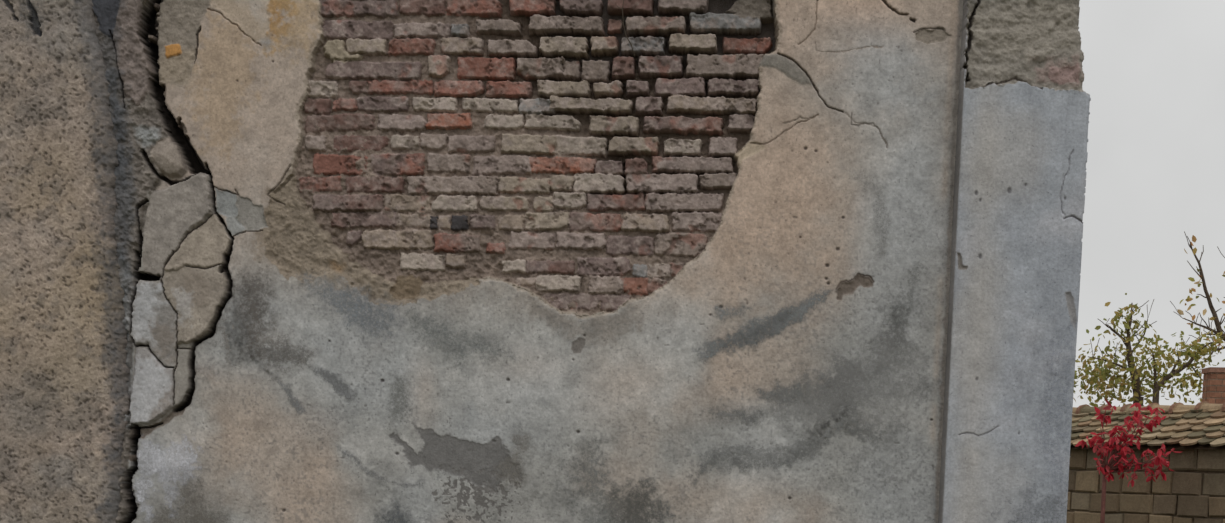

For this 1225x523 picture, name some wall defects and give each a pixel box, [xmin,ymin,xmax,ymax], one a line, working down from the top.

crack [750,0,889,148]
crack [882,0,917,23]
crack [964,0,981,82]
spalling [913,0,1089,96]
crack [127,1,291,523]
spalling [92,0,780,523]
spalling [836,274,875,302]
spalling [1065,292,1078,330]
leakage [695,292,926,483]